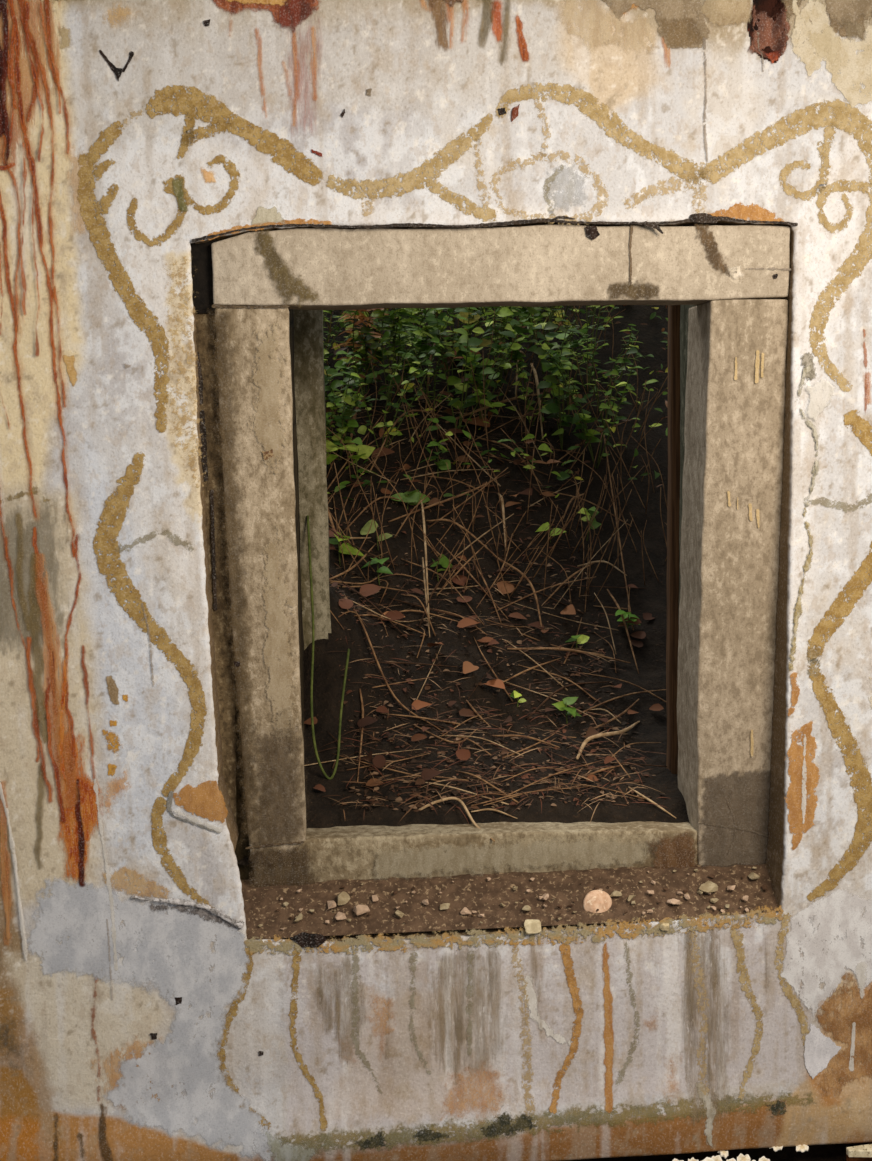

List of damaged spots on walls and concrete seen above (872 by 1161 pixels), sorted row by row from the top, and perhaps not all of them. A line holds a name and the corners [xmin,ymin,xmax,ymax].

corrosion [256,29,266,111]
spalling [213,0,319,33]
corrosion [285,28,319,127]
corrosion [421,0,468,49]
corrosion [479,0,529,62]
flaking render [602,0,710,49]
flaking render [748,0,872,108]
corrosion [0,0,129,887]
flaking render [106,676,119,704]
corrosion [0,782,10,939]
flaking render [0,766,327,1161]
flaking render [781,889,872,1093]